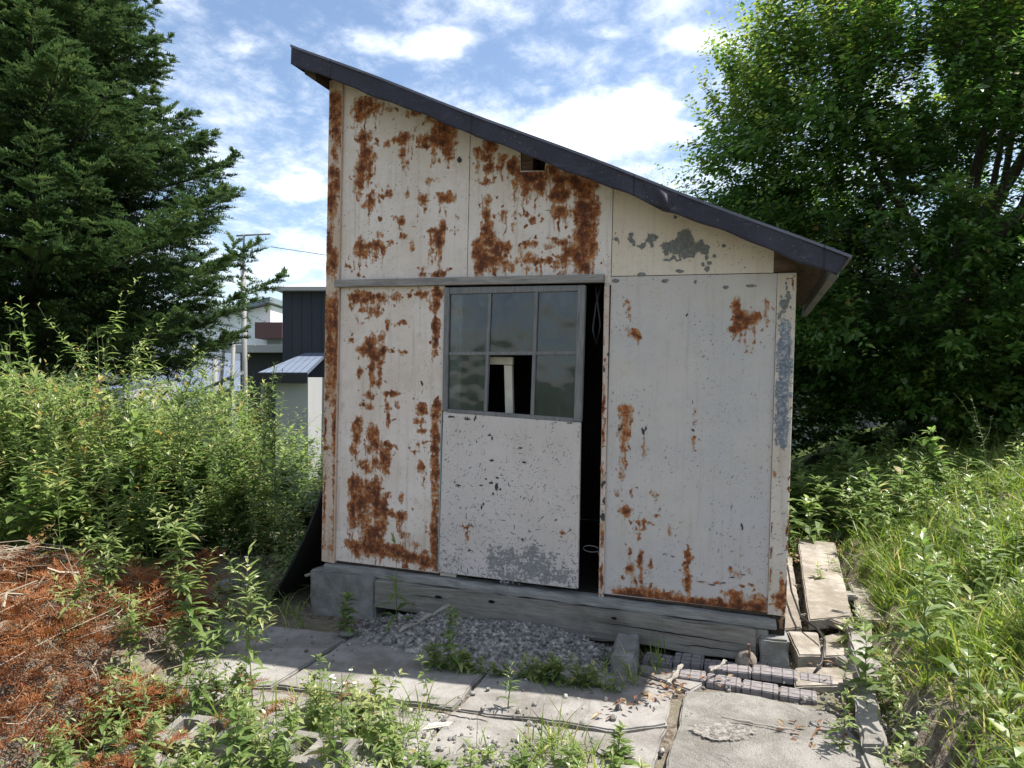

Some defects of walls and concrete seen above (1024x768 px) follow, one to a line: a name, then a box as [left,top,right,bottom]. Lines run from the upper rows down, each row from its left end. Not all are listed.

corrosion [468,140,602,276]
peeling [612,228,726,284]
corrosion [321,90,459,572]
corrosion [729,296,774,353]
peeling [773,282,793,450]
peeling [483,542,577,587]
corrosion [599,383,789,629]